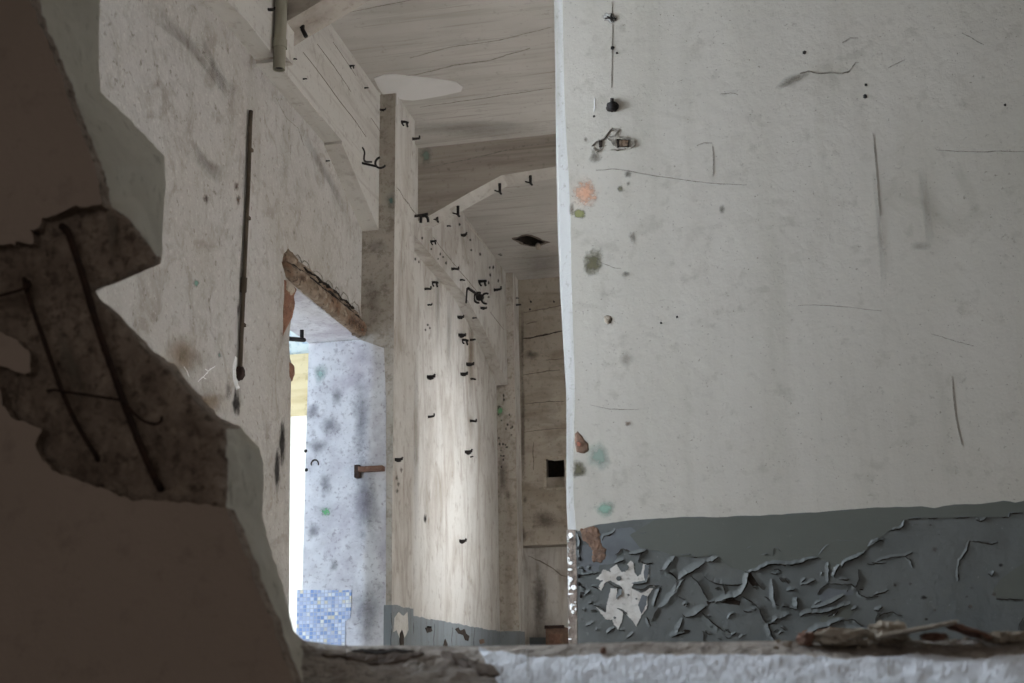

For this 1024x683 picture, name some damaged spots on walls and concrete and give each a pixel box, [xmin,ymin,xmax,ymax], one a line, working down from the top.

spalling [283,280,297,335]
flaking render [282,248,361,319]
water stain [585,252,628,276]
spalling [0,207,228,507]
corrosion [580,525,606,563]
peeling [440,516,1024,683]